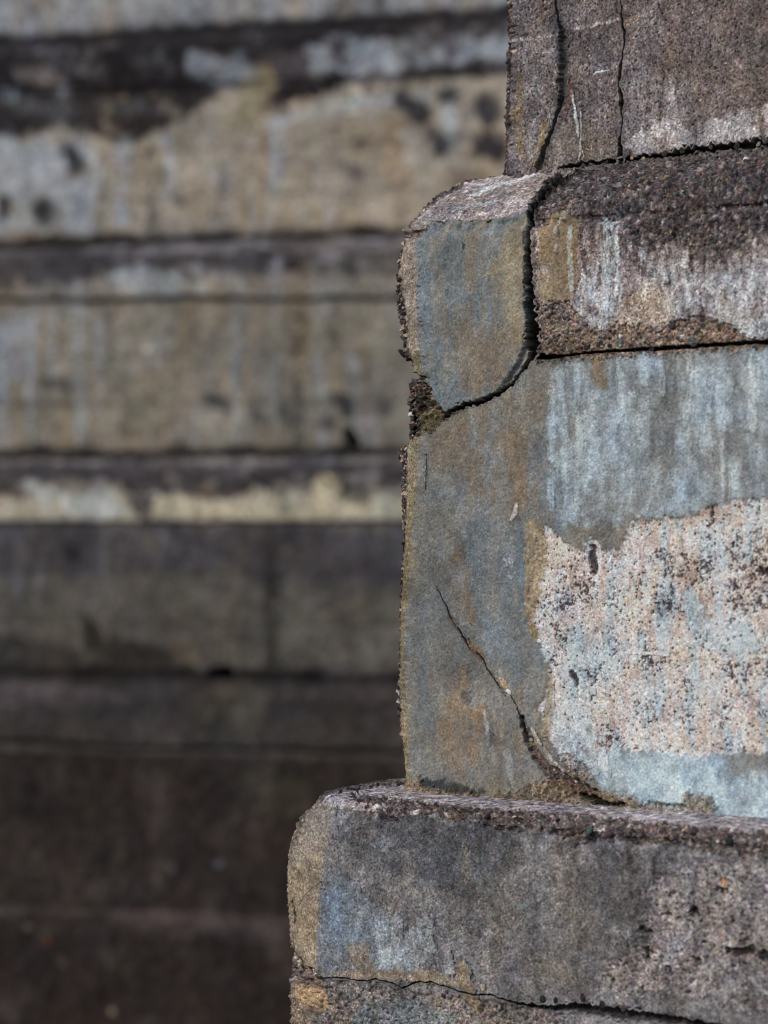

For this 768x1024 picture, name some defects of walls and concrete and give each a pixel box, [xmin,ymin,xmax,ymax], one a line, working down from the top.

crack [615,0,629,166]
crack [436,587,530,737]
peeling [347,496,768,1012]
crack [295,951,731,1024]